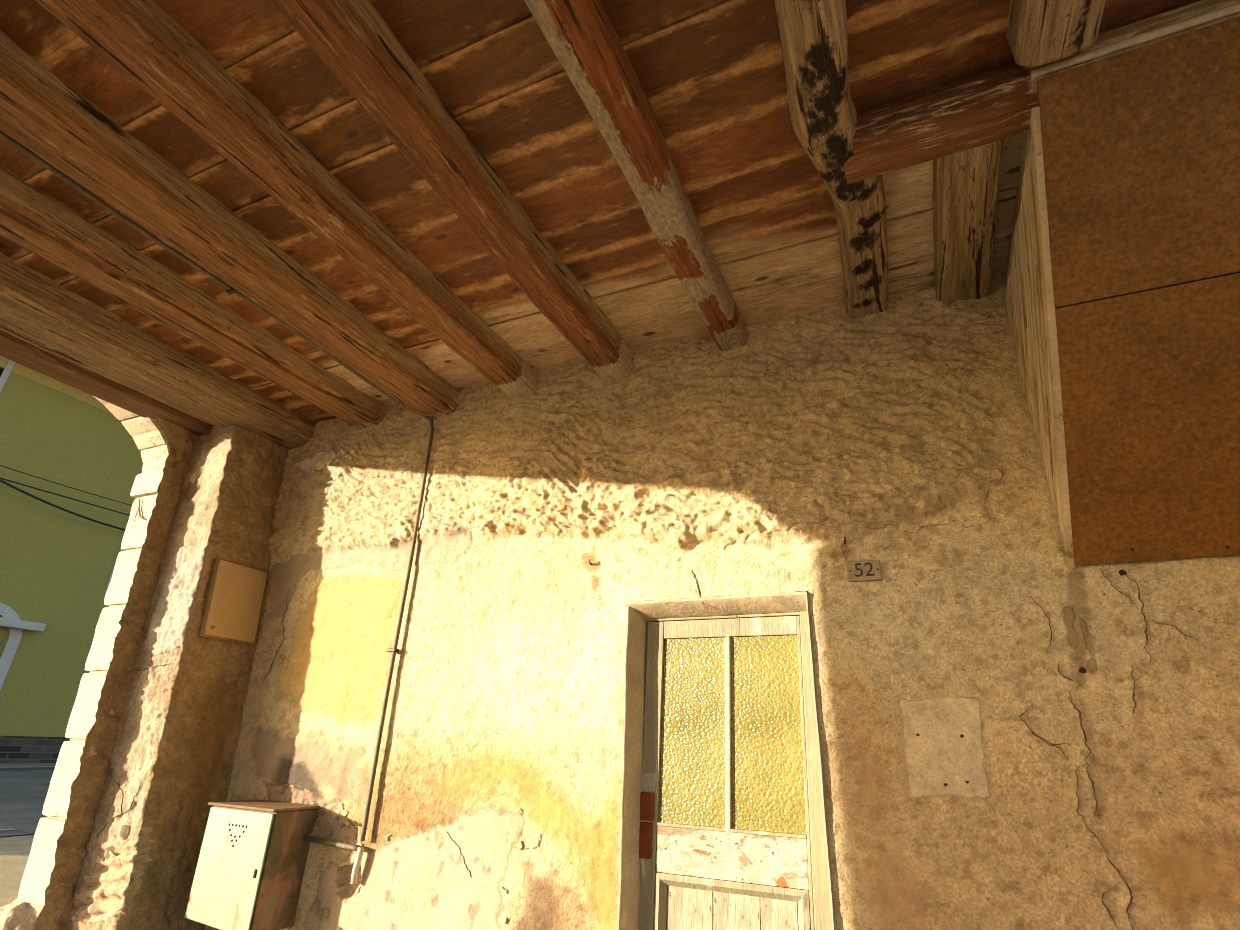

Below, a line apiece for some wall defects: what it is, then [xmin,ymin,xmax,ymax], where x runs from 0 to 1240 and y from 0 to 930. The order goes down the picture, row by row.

crack [1099,569,1192,716]
leakage [255,728,363,795]
crack [1019,598,1133,930]
flaking render [265,782,524,930]
leakage [524,881,555,930]